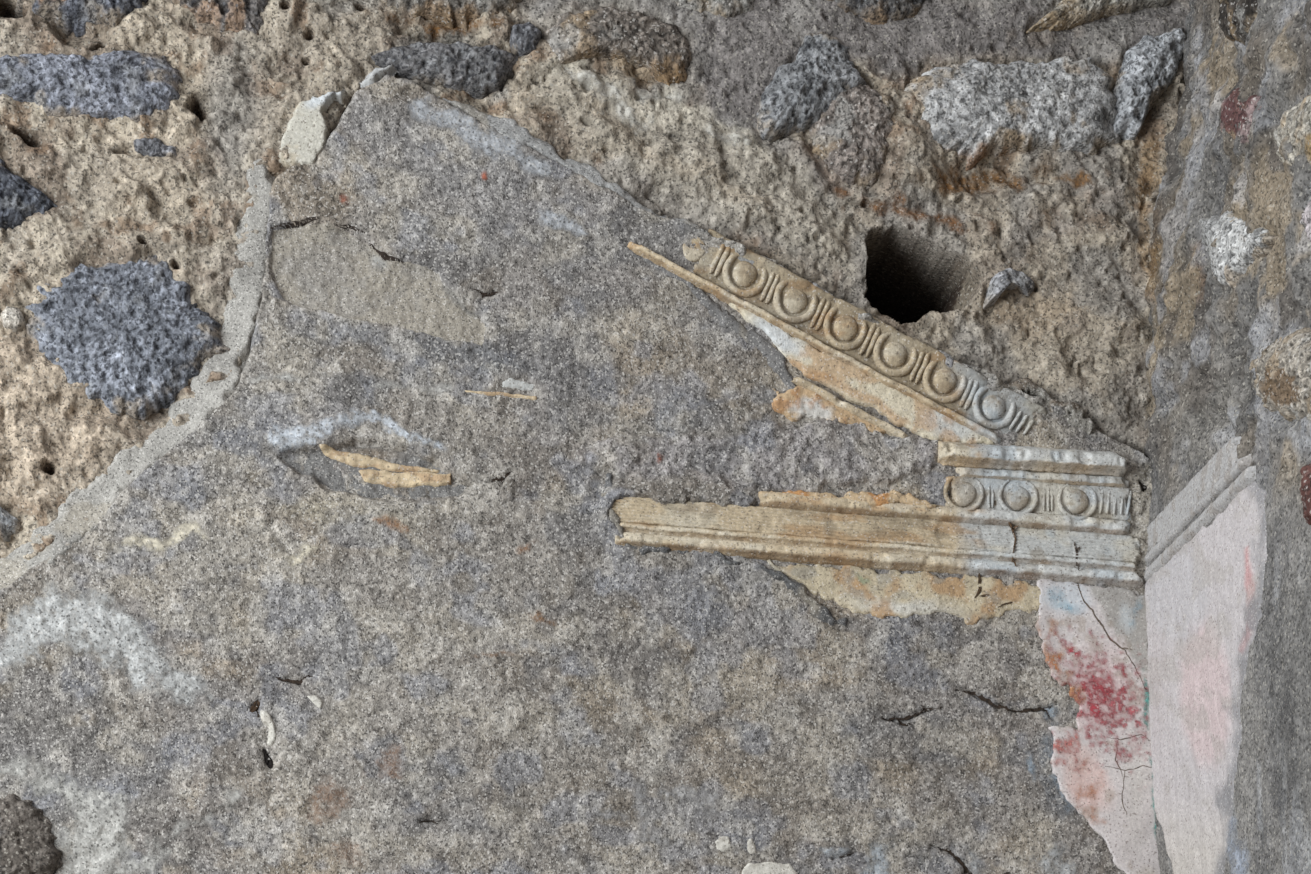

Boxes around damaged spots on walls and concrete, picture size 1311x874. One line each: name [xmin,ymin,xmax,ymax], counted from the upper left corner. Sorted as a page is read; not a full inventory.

spalling [0,0,30,19]
spalling [7,124,42,148]
spalling [183,92,210,124]
peeling [278,64,399,168]
spalling [270,217,486,346]
spalling [772,386,886,434]
spalling [38,456,59,477]
spalling [282,444,469,500]
crack [1074,542,1146,689]
crack [882,689,1056,726]
crack [1106,734,1152,815]
crack [933,846,972,874]